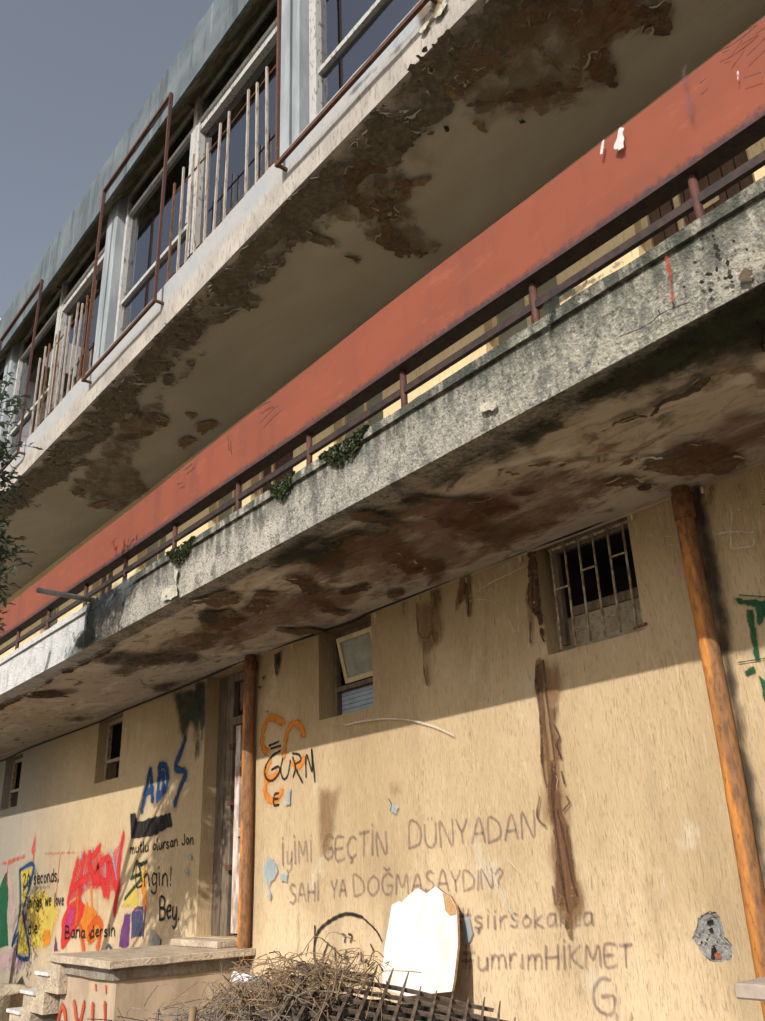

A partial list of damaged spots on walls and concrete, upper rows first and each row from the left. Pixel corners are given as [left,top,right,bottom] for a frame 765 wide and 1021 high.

peeling [0,0,673,516]
water stain [73,367,193,511]
water stain [571,286,765,442]
water stain [74,574,136,649]
water stain [94,422,630,689]
water stain [152,682,205,758]
corrosion [534,658,582,939]
spalling [692,911,733,963]